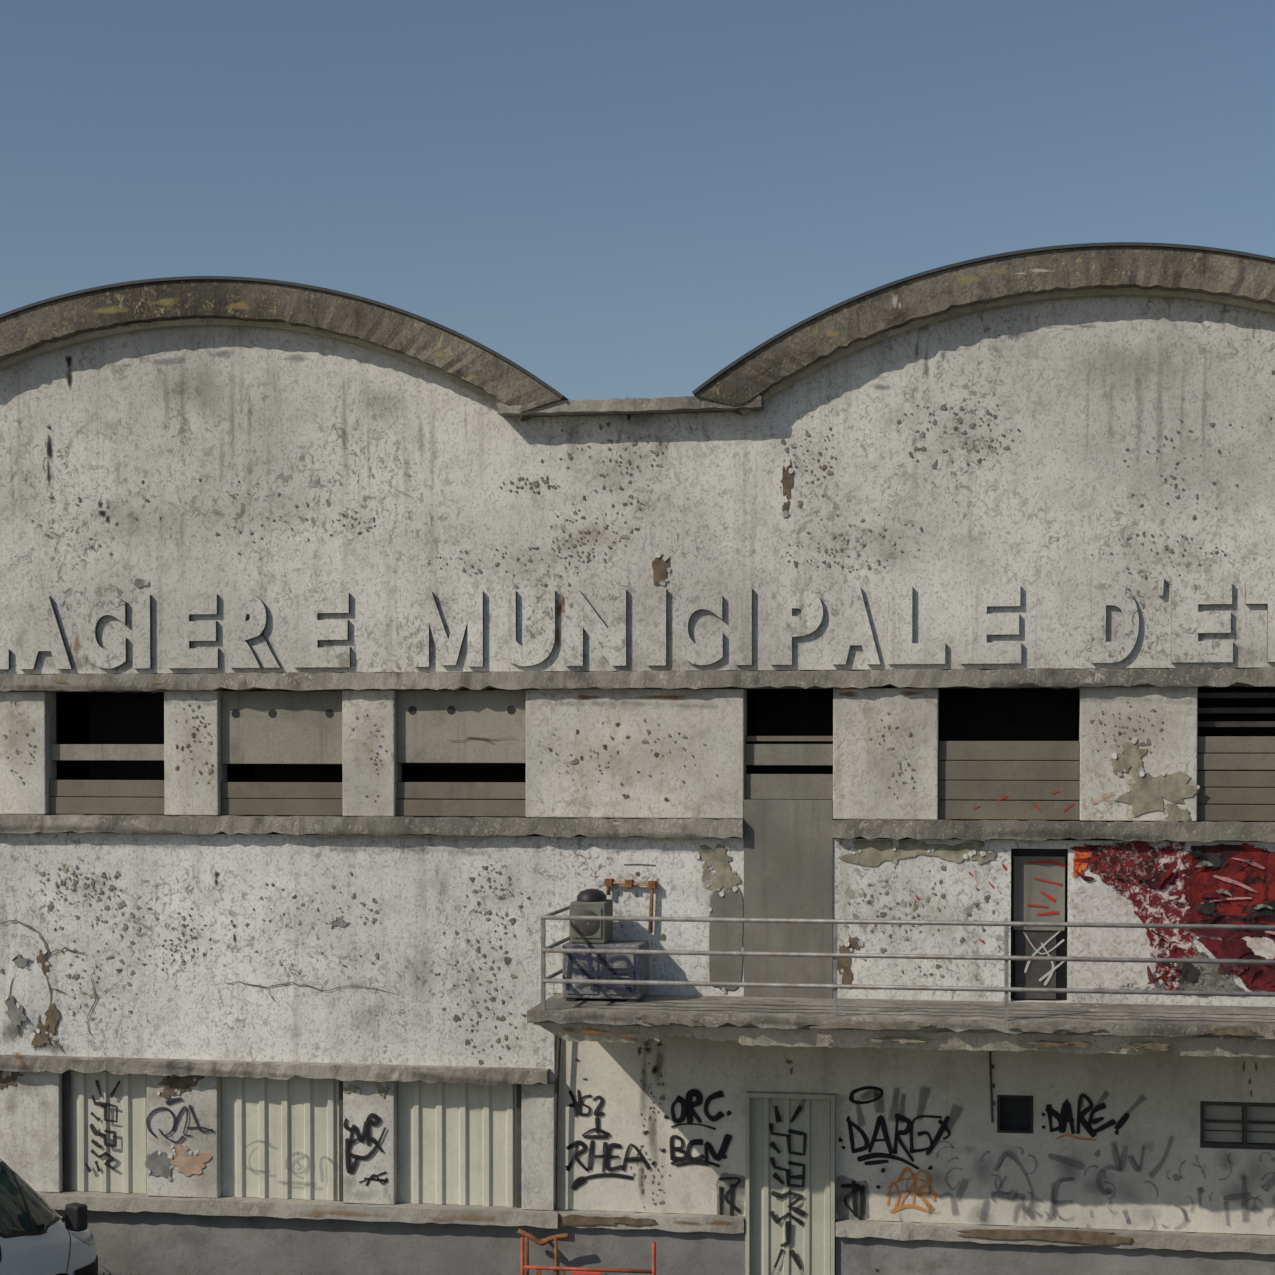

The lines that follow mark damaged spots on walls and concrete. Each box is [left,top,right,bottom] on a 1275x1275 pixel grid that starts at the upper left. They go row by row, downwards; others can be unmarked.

peeling [427,422,666,588]
spalling [780,411,836,517]
spalling [652,552,671,586]
peeling [1089,701,1200,823]
crack [1,920,114,1054]
peeling [0,865,211,1049]
crack [210,978,396,1000]
spalling [635,1015,703,1126]
peeling [695,842,744,993]
spalling [809,1021,933,1044]
peeling [837,839,997,984]